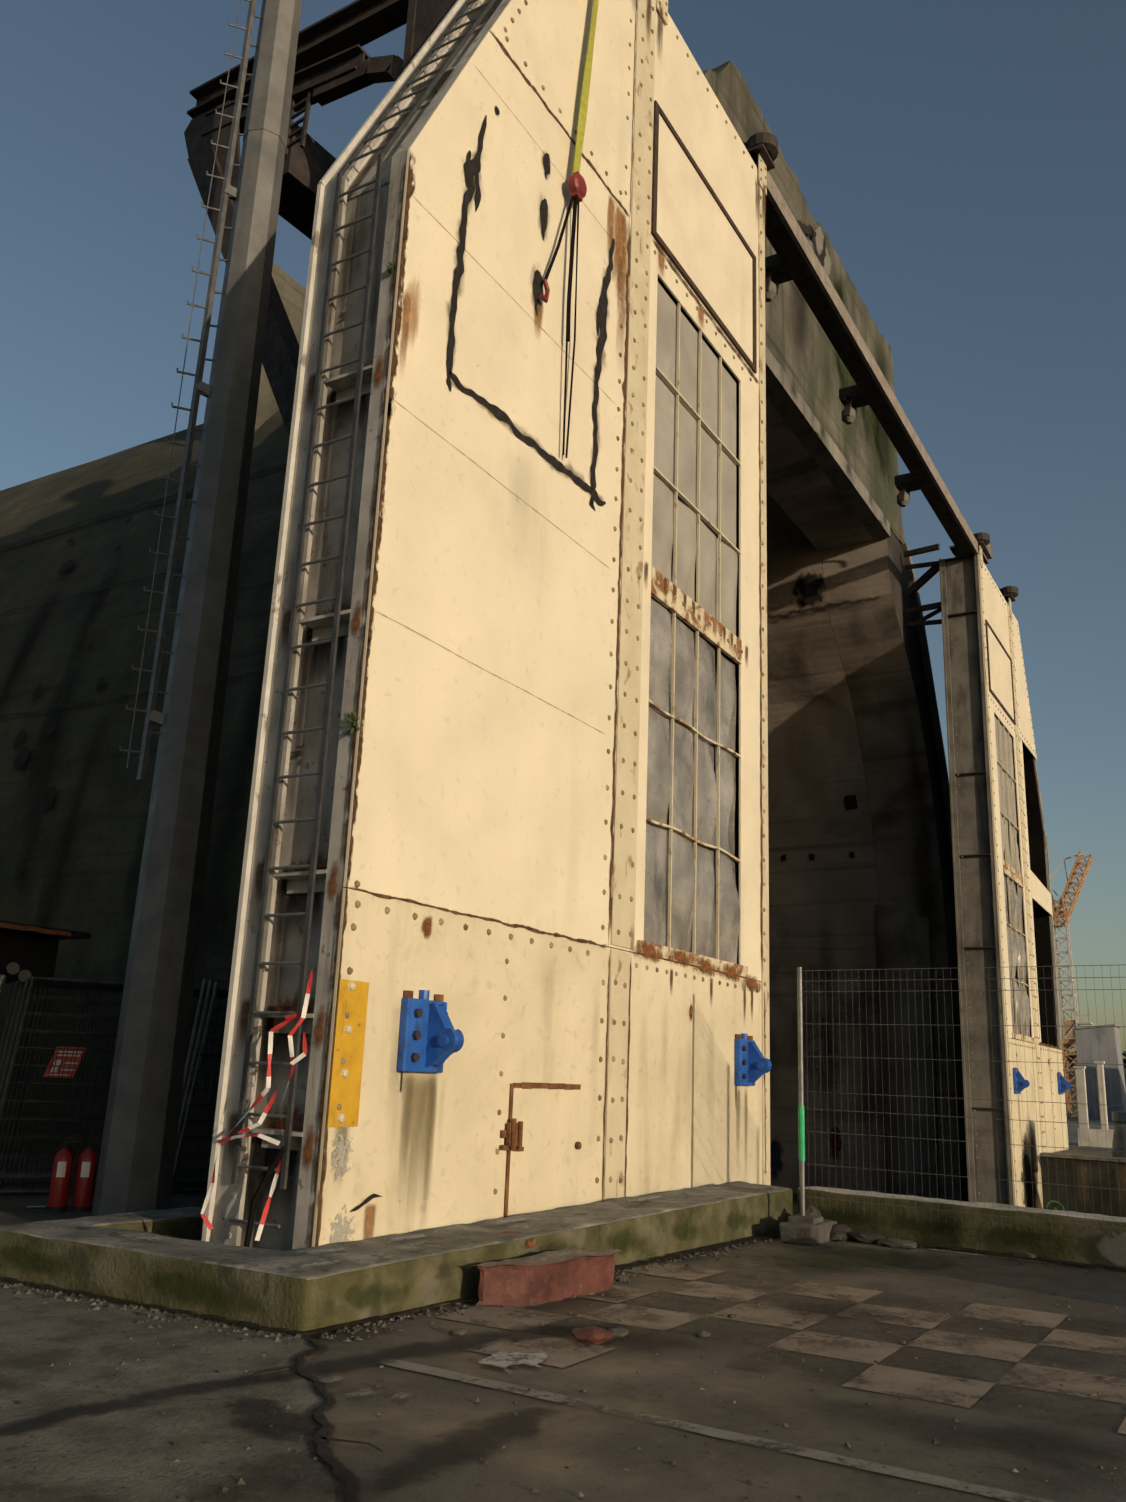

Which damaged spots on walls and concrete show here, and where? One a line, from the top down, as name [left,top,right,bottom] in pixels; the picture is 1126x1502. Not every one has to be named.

corrosion [631,0,663,182]
corrosion [757,179,766,220]
corrosion [655,240,759,383]
corrosion [493,34,631,926]
corrosion [265,154,610,1248]
corrosion [624,455,766,1197]
corrosion [255,862,265,896]
corrosion [240,1001,250,1037]
corrosion [228,1114,238,1152]
leakage [405,1081,435,1134]
leakage [1021,1128,1038,1208]